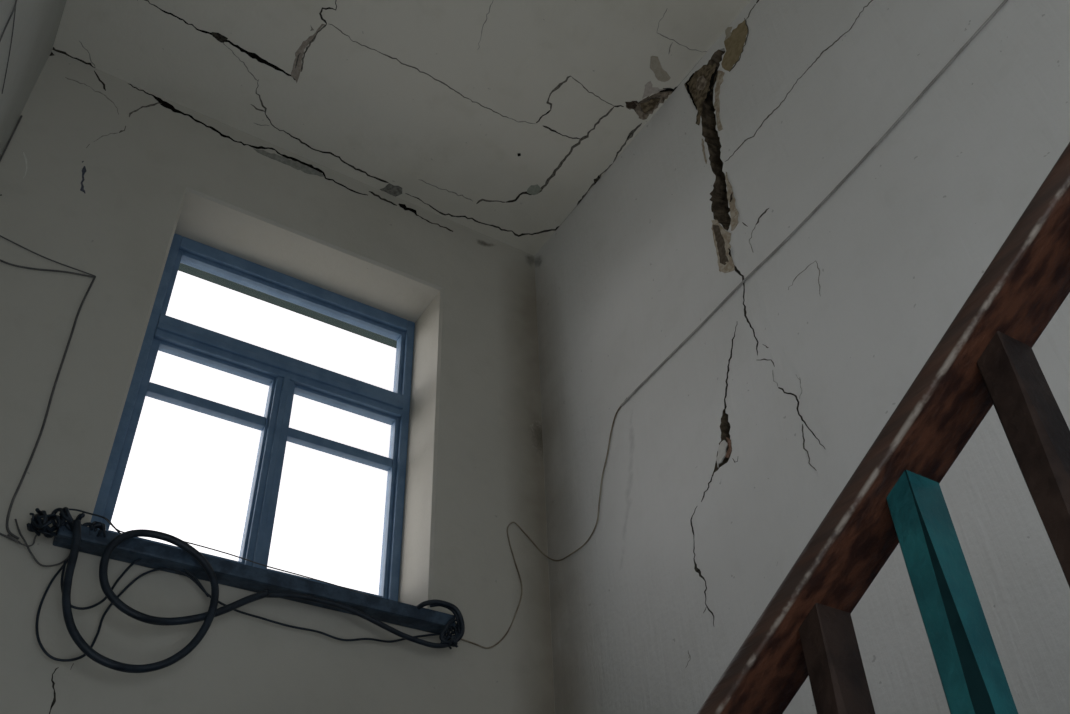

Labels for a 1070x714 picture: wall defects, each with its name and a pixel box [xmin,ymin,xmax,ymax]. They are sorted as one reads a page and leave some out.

peeling [291,0,337,83]
crack [50,0,642,237]
spalling [625,56,702,120]
crack [657,0,873,471]
spalling [701,325,738,502]
crack [690,507,714,626]